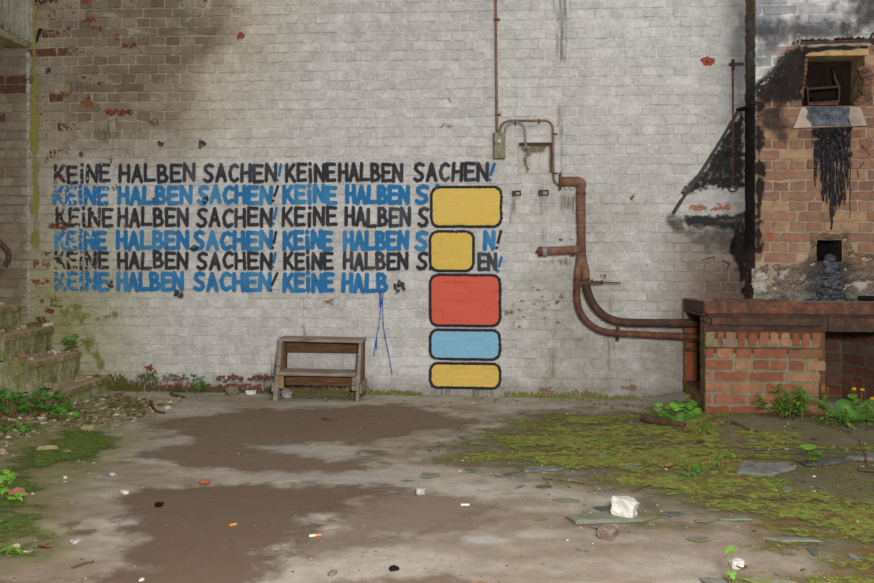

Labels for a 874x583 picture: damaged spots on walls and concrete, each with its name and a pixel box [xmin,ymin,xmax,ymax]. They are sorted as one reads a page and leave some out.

spalling [853,66,874,109]
spalling [751,232,874,301]